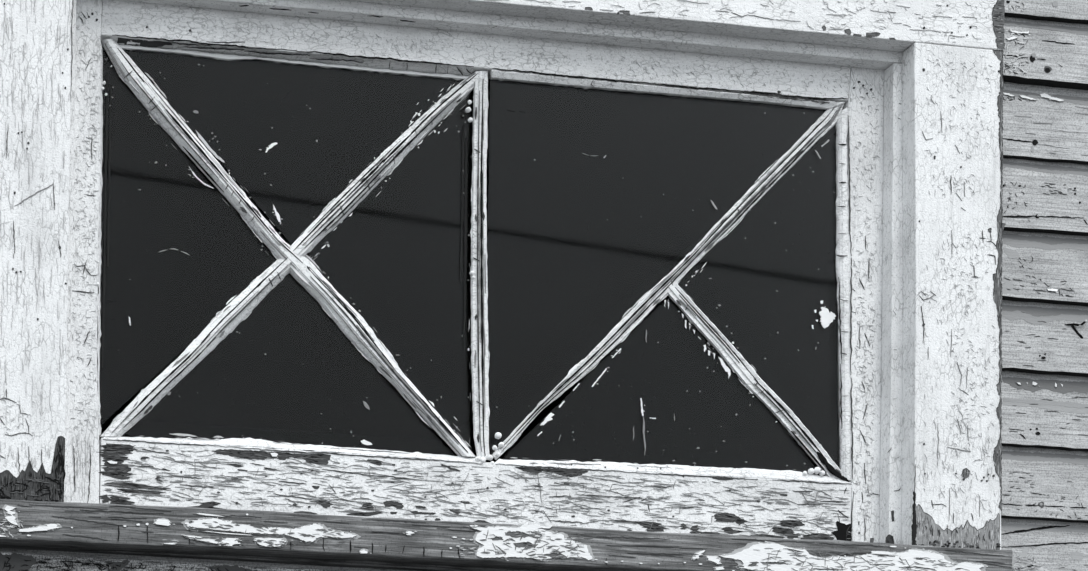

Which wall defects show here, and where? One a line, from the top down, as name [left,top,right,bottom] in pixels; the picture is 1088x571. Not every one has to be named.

crack [600,0,993,211]
peeling [684,0,1076,571]
peeling [516,464,588,485]
peeling [449,511,607,563]
peeling [607,509,747,534]